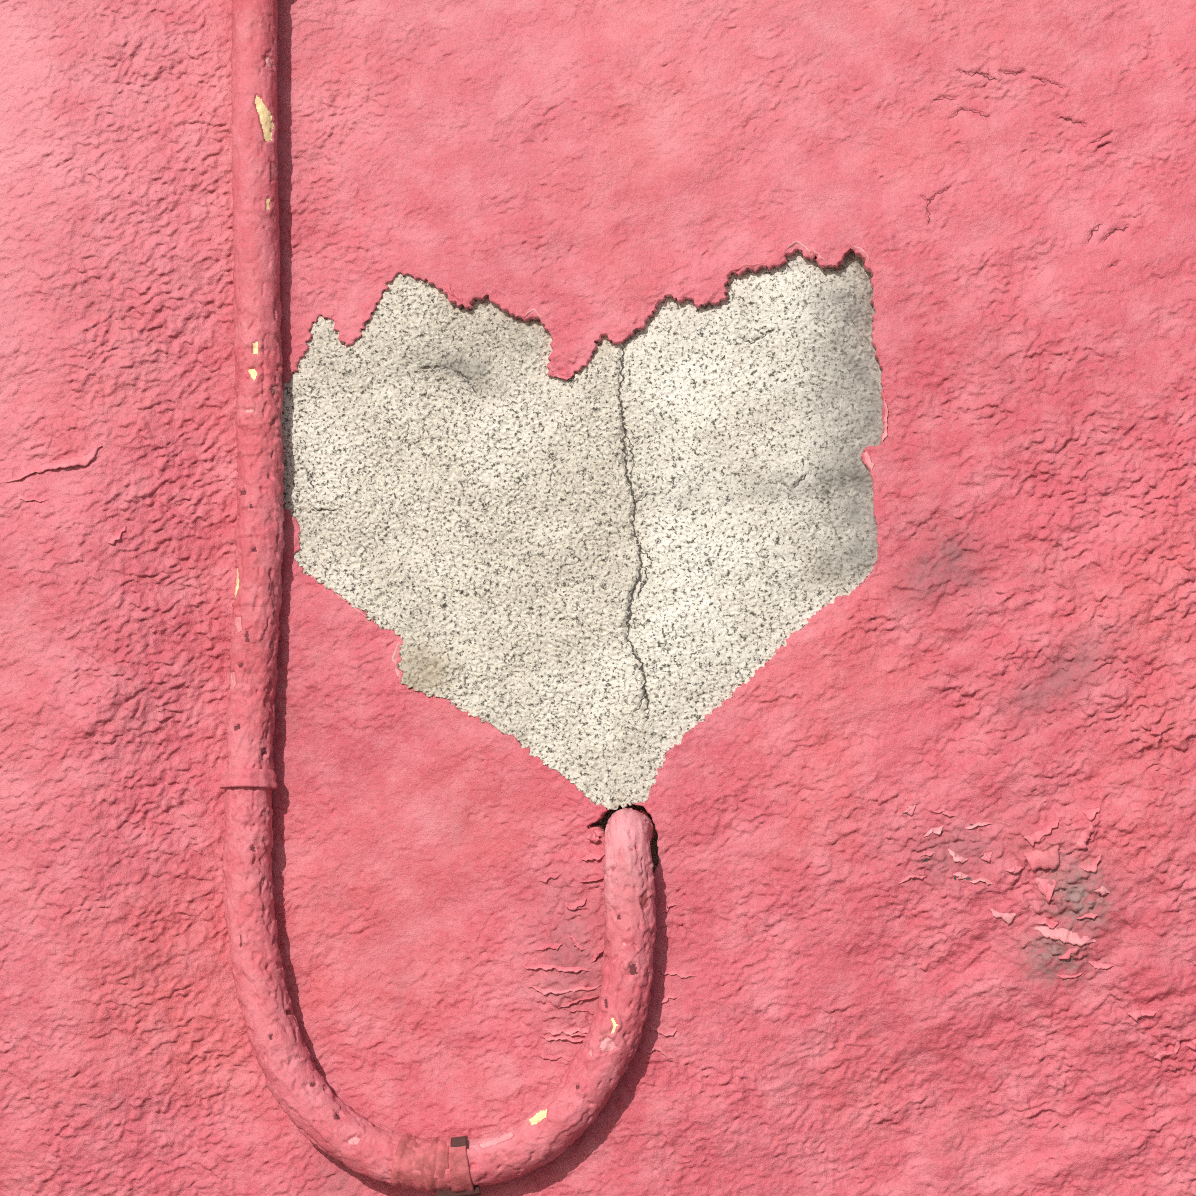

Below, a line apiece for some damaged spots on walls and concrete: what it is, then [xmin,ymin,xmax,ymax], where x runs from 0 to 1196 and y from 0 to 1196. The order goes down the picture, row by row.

spalling [272,241,888,810]
crack [617,348,653,721]
peeling [521,935,618,1061]
peeling [899,809,992,885]
peeling [990,908,1016,924]
spalling [1005,807,1114,979]